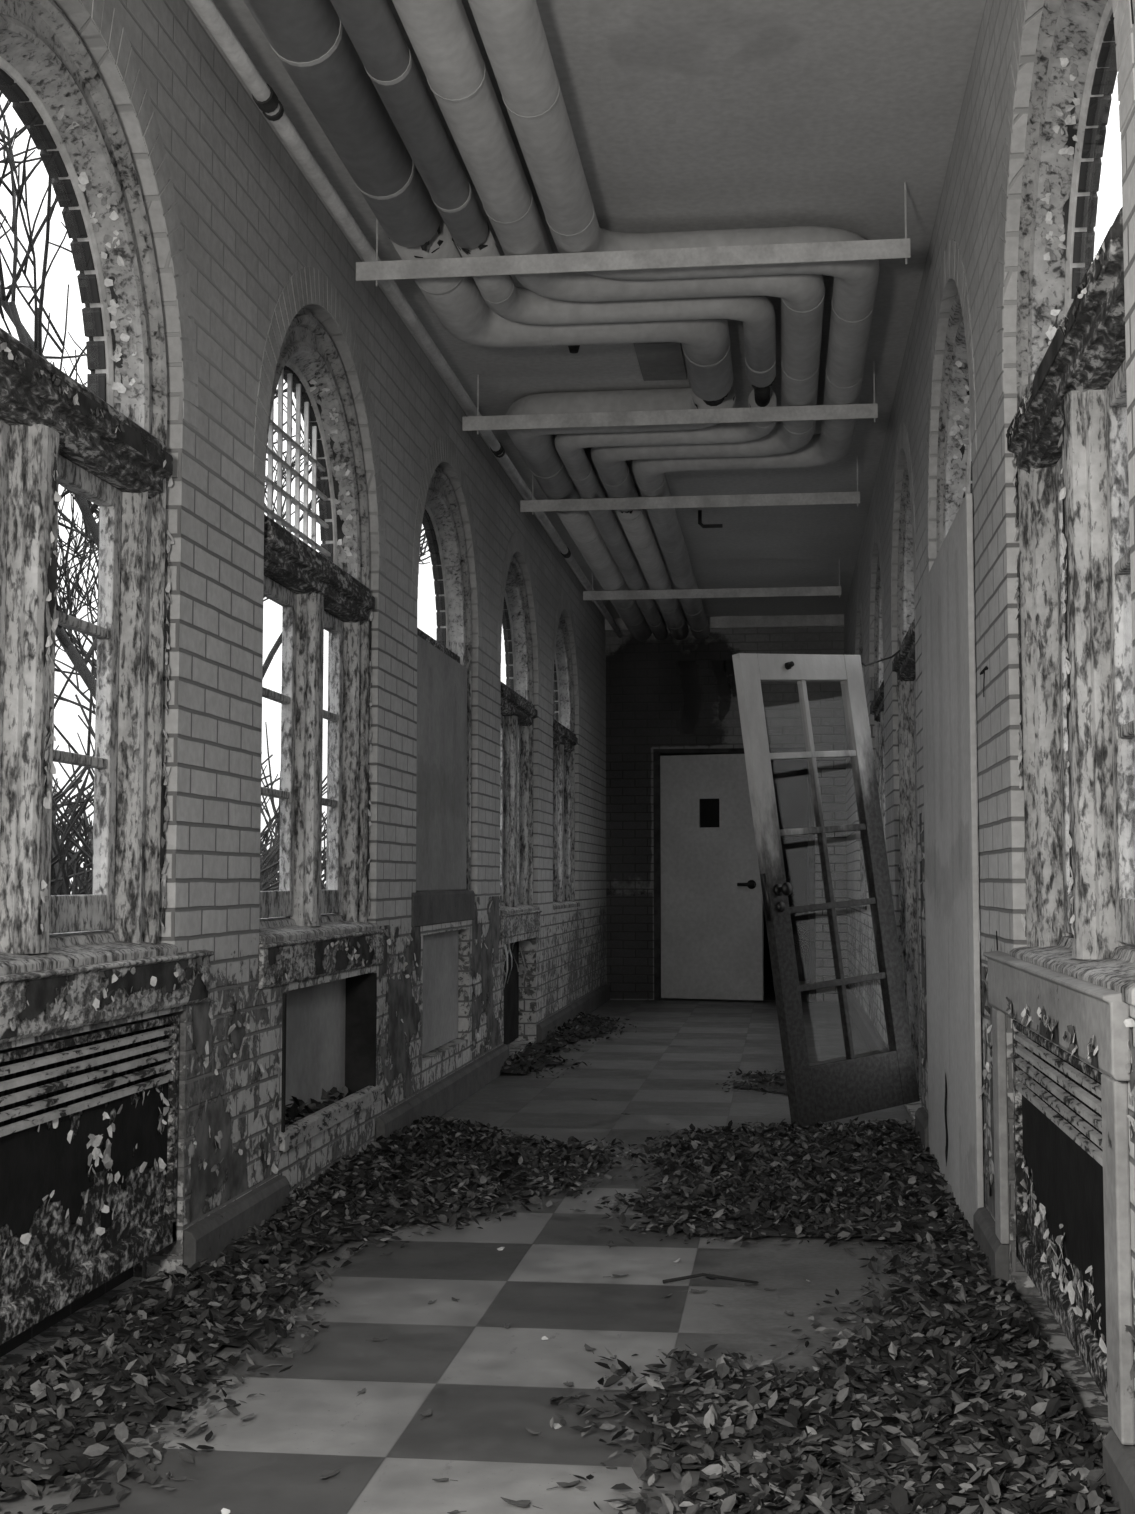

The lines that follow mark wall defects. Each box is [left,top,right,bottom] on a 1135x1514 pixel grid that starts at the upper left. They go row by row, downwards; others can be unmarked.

peeling [1040,180,1070,262]
peeling [1050,42,1091,159]
peeling [42,437,61,822]
peeling [0,1082,170,1259]
peeling [0,956,281,1222]
peeling [160,530,174,931]
peeling [268,611,422,1106]
peeling [472,896,526,1060]
peeling [979,966,1098,1217]
peeling [1006,241,1105,789]
peeling [1020,1095,1107,1353]
peeling [1124,1017,1135,1144]